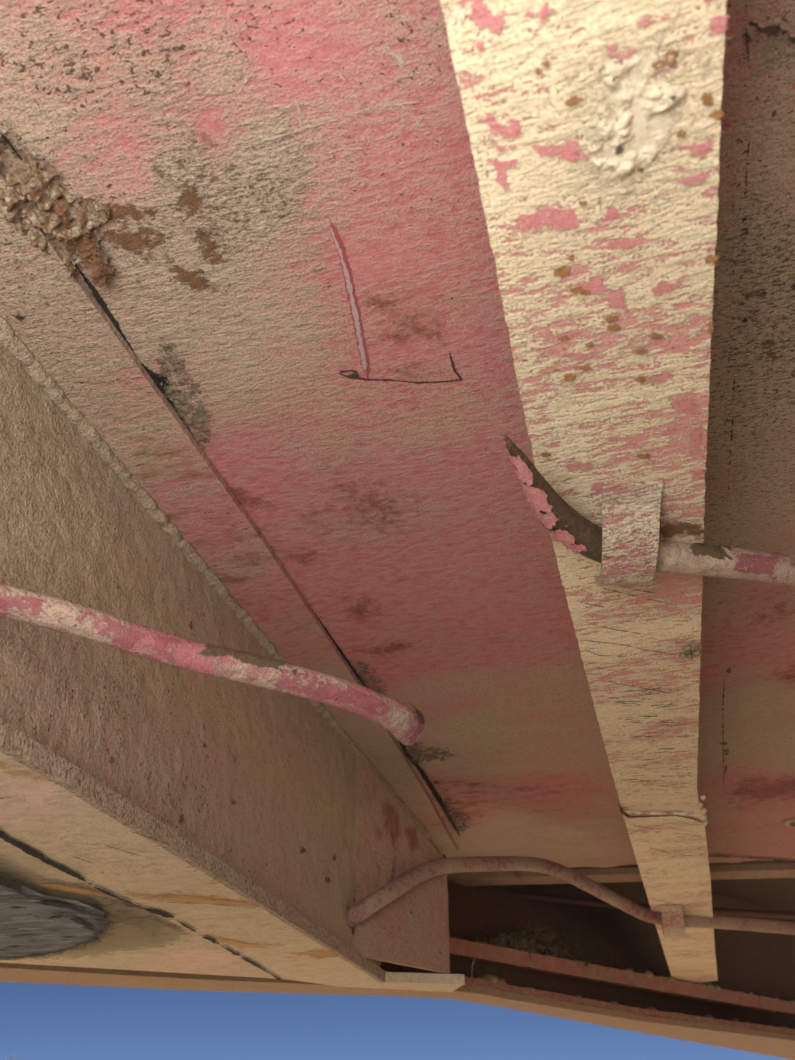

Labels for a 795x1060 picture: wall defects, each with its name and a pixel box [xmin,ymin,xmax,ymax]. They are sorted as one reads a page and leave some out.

peeling [469,0,508,56]
peeling [704,0,732,39]
crack [743,5,751,69]
peeling [484,112,522,196]
peeling [530,140,602,166]
peeling [672,134,719,188]
crack [735,139,750,221]
peeling [514,200,589,235]
peeling [604,233,662,274]
spalling [328,217,370,378]
peeling [506,442,602,563]
crack [584,588,795,862]